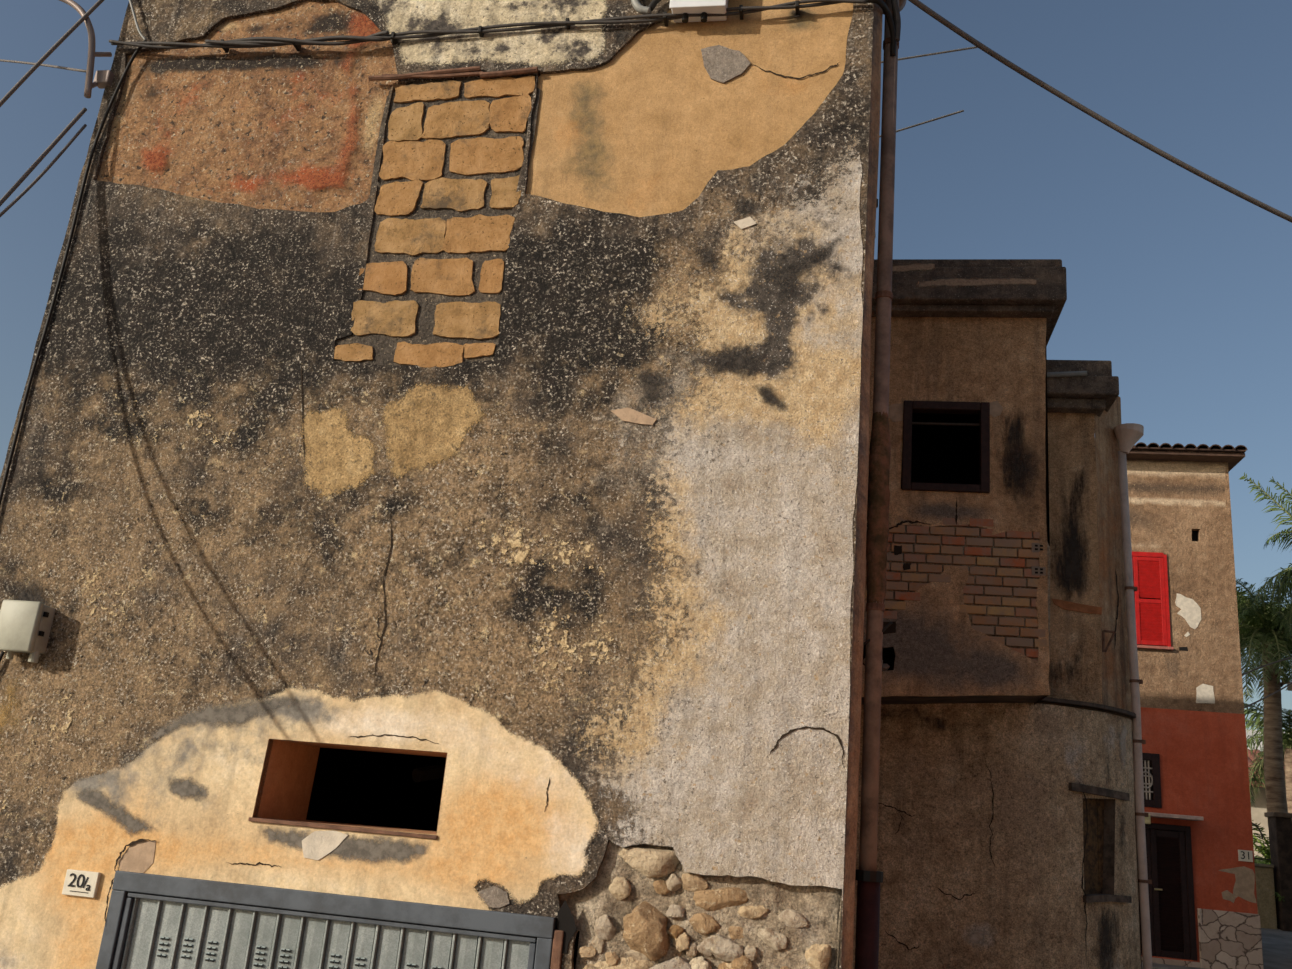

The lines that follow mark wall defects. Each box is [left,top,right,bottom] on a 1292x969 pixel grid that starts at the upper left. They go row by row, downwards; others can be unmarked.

crack [752,63,838,79]
leakage [769,239,840,300]
leakage [639,371,666,398]
leakage [713,351,763,374]
leakage [758,387,786,409]
leakage [1002,418,1028,497]
leakage [1051,474,1089,598]
crack [374,512,392,677]
flaking render [883,517,1102,663]
crack [770,726,844,767]
peeling [1219,866,1257,903]
leakage [1099,913,1119,969]